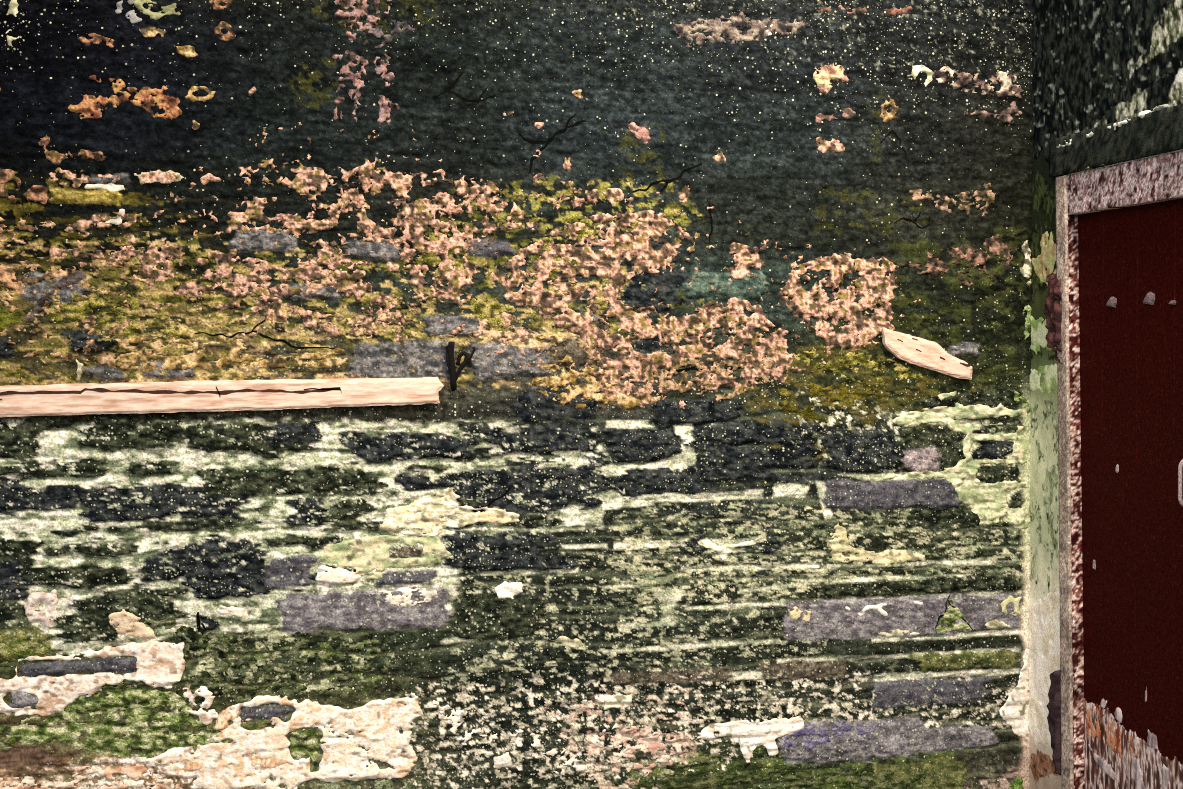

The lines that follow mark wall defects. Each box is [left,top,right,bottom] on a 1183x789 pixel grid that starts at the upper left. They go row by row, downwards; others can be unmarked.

peeling [6,0,19,17]
peeling [115,0,180,38]
flaking render [209,0,235,41]
flaking render [78,33,114,48]
flaking render [176,45,198,58]
peeling [332,0,425,139]
flaking render [0,135,1058,410]
flaking render [24,589,58,628]
peeling [216,606,245,617]
flaking render [0,609,589,789]
peeling [1083,698,1183,789]